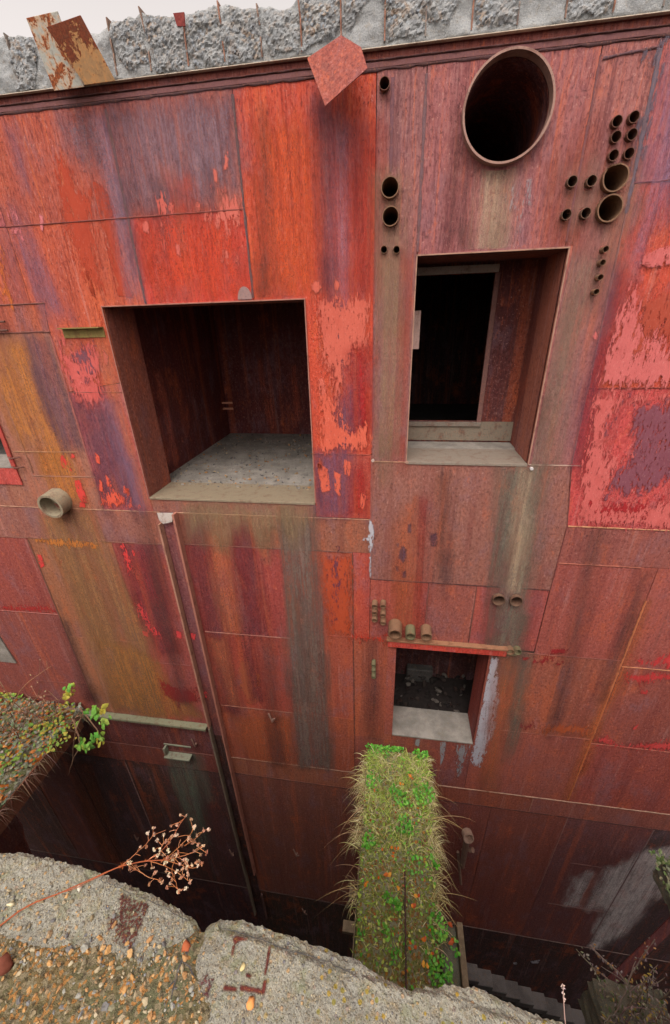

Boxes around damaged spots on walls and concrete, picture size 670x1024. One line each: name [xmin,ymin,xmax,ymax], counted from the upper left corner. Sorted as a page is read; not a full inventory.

peeling [58,335,116,412]
peeling [311,280,379,496]
peeling [577,245,670,535]
peeling [60,454,141,509]
damp [440,116,648,777]
rust [318,546,387,648]
efflorescence [566,848,670,948]